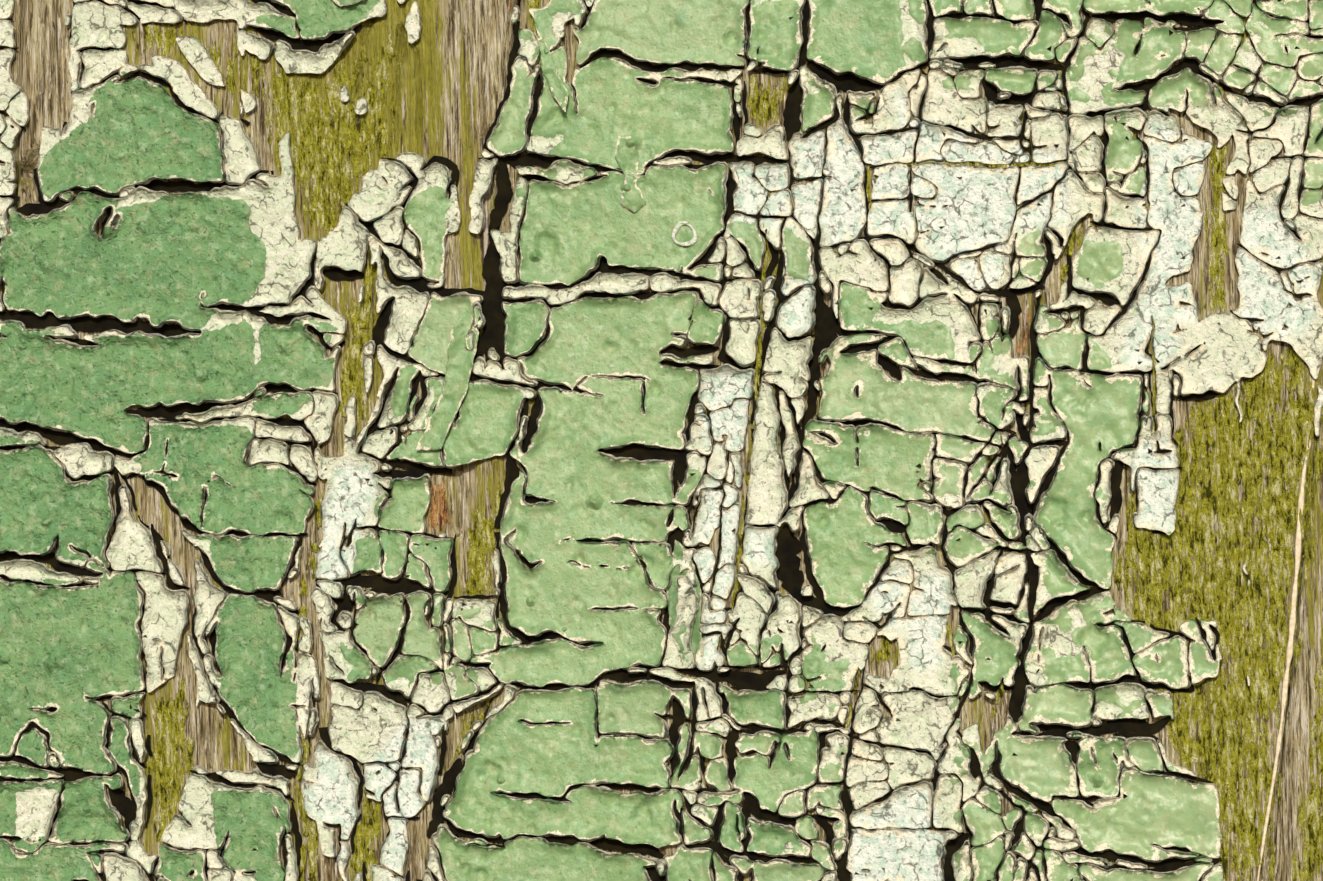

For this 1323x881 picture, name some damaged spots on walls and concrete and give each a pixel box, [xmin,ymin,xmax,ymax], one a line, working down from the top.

crack [62,0,251,135]
crack [248,0,362,52]
crack [0,160,274,243]
crack [0,281,201,346]
crack [202,251,365,350]
peeling [0,0,851,881]
peeling [486,0,1323,881]
crack [0,384,338,881]